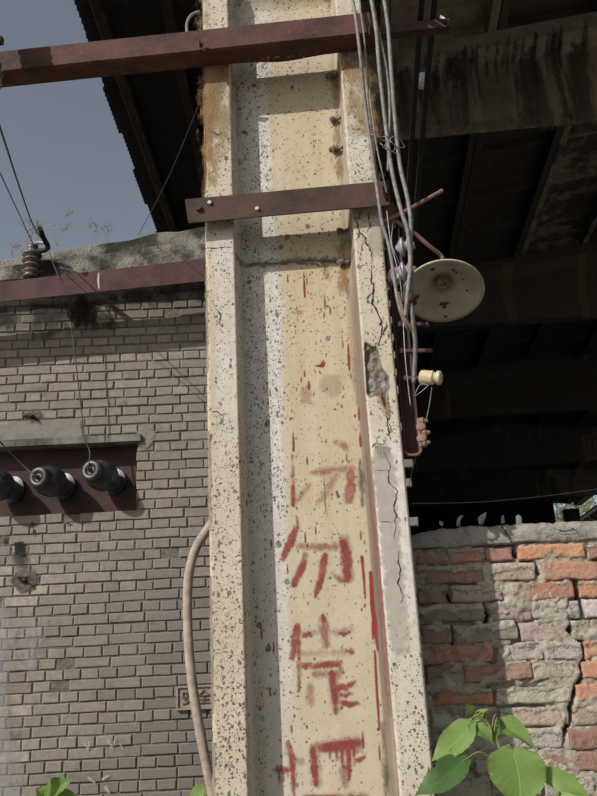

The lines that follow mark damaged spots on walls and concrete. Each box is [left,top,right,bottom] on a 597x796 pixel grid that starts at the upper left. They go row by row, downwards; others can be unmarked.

rust [200,64,235,188]
water stain [393,25,597,136]
water stain [31,284,206,335]
crack [356,207,387,347]
spalling [364,342,389,415]
crack [371,416,403,602]